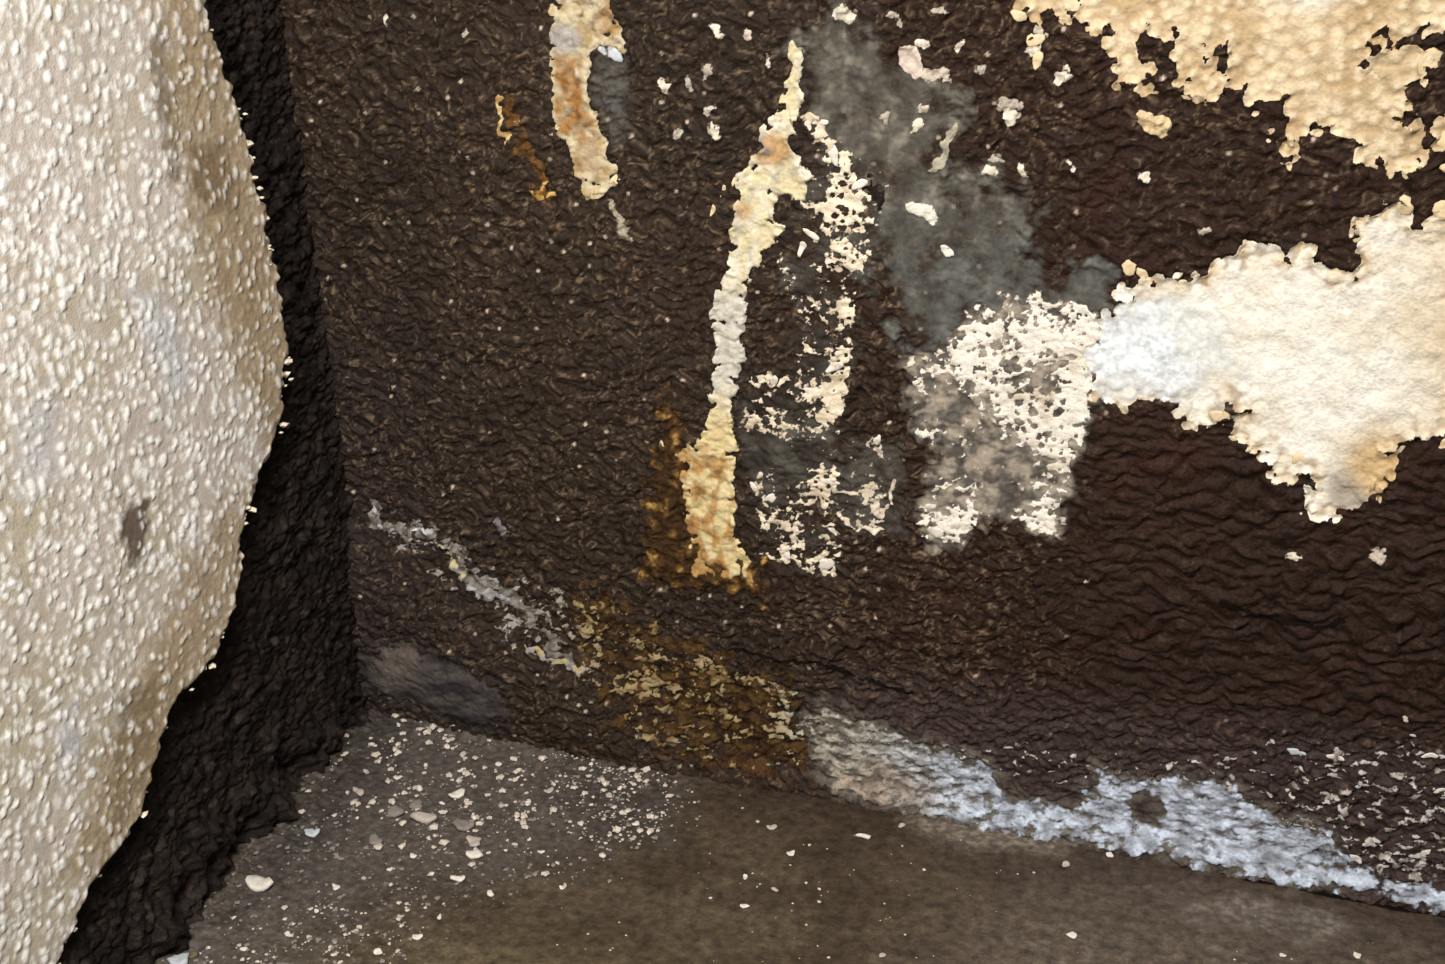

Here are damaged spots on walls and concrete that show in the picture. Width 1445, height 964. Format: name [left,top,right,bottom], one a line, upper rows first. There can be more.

rust [495,95,557,203]
spalling [657,64,713,94]
spalling [703,106,721,141]
damp [638,1,1120,610]
peeling [739,0,1445,577]
rust [560,580,824,788]
damp [799,705,1445,912]
damp [1186,896,1348,944]